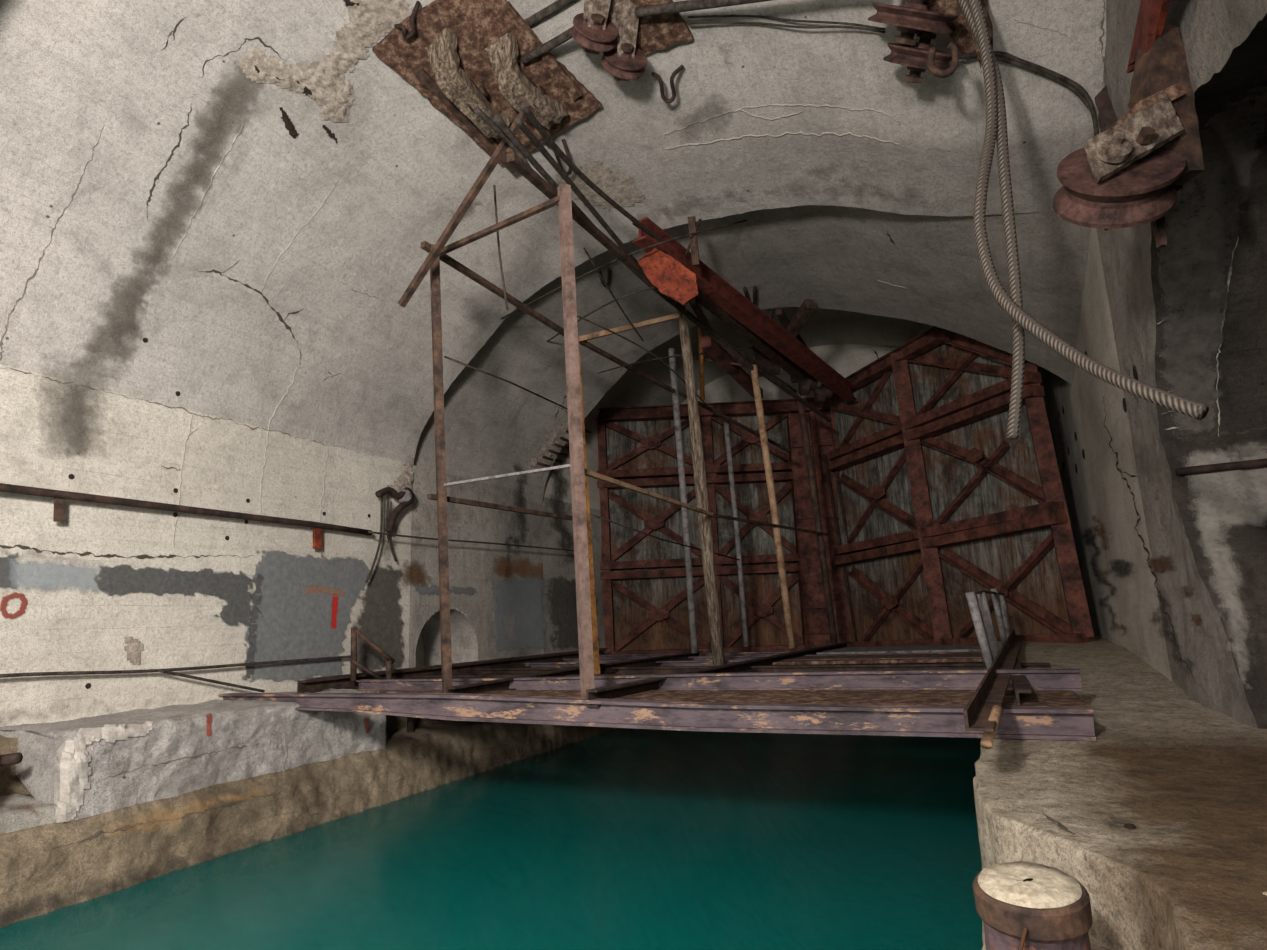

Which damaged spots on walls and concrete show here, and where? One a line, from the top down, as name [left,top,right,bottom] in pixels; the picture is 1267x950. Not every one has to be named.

crack [161,17,187,51]
crack [146,37,286,206]
spalling [237,0,412,143]
water stain [49,74,255,453]
crack [0,126,380,458]
crack [0,544,253,559]
peeling [0,458,414,682]
peeling [493,576,579,650]